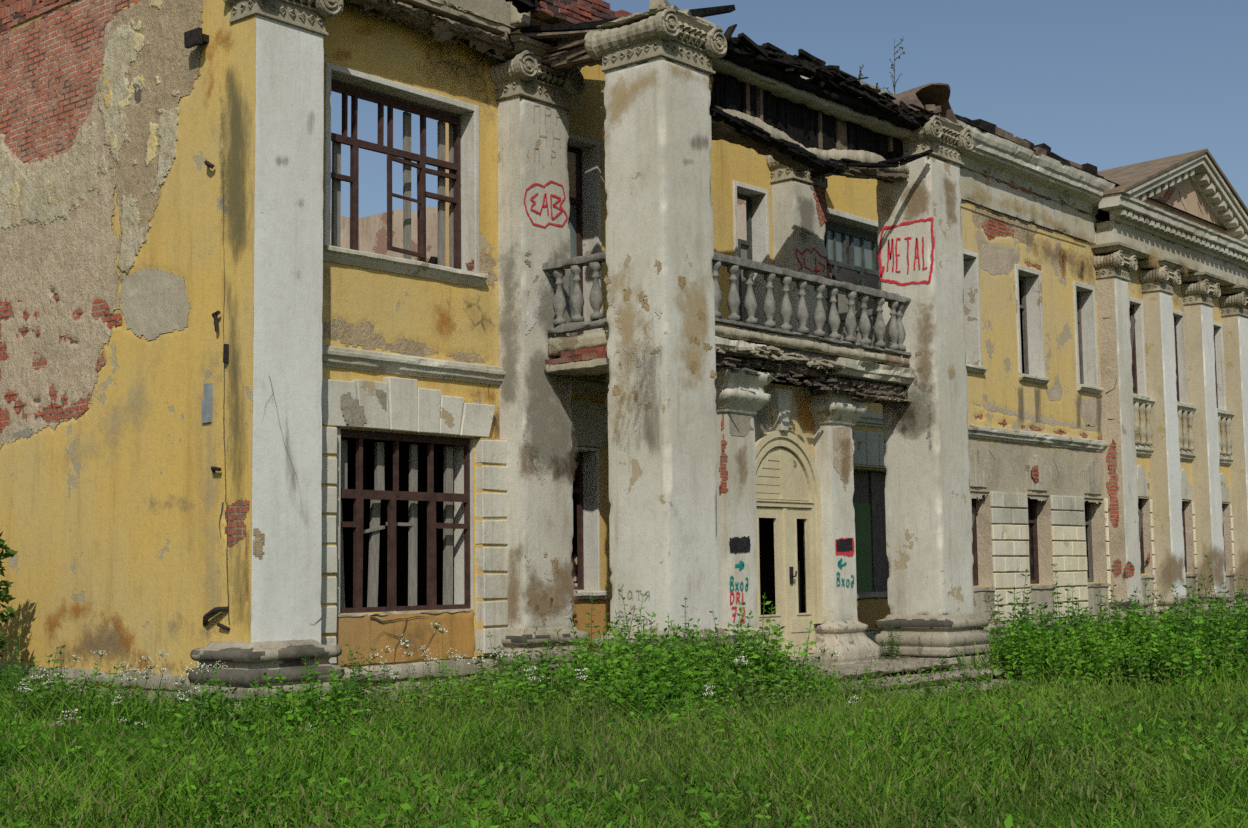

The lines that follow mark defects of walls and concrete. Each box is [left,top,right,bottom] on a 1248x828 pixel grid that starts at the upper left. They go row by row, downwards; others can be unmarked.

leakage [221,75,245,252]
peeling [0,0,203,447]
leakage [230,349,239,465]
spalling [716,353,911,405]
peeling [968,384,1119,527]
flaking render [225,498,265,559]
flaking render [1111,552,1150,577]